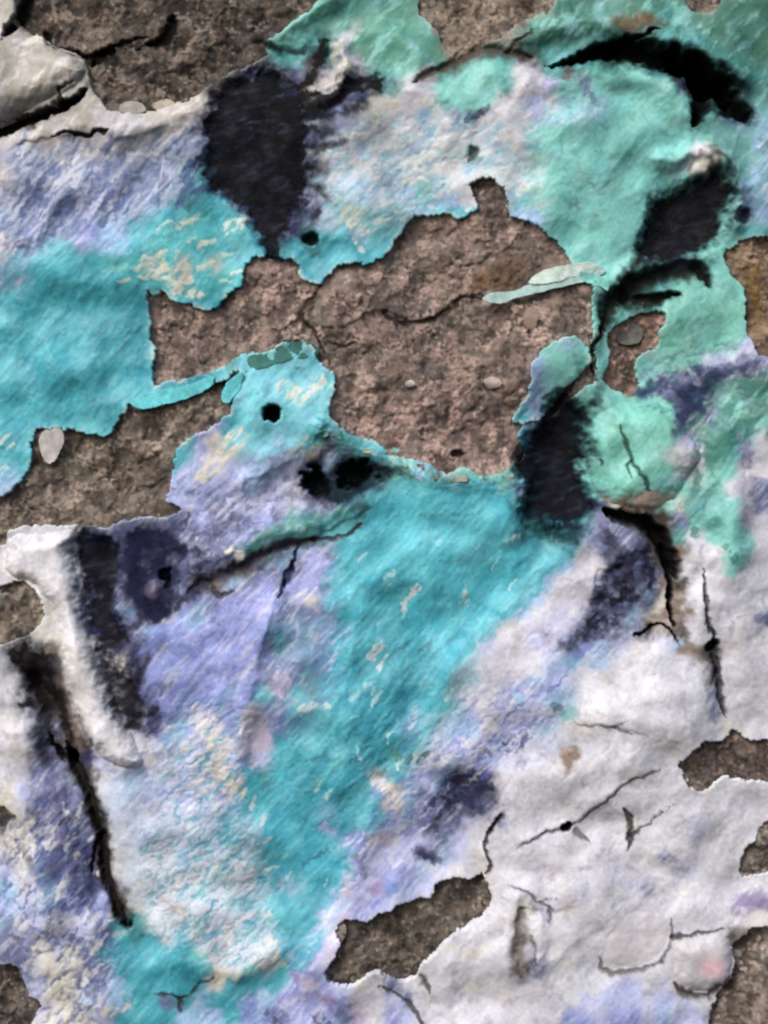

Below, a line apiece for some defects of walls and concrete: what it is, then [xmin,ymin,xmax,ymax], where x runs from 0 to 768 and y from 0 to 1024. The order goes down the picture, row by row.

spalling [13,0,318,114]
damp [198,33,385,259]
damp [616,150,738,289]
peeling [0,178,665,546]
peeling [723,237,768,357]
damp [512,376,601,544]
crack [187,523,362,598]
crack [600,425,726,716]
crack [48,731,133,929]
crack [517,771,674,851]
peeling [678,729,768,791]
peeling [325,872,492,984]